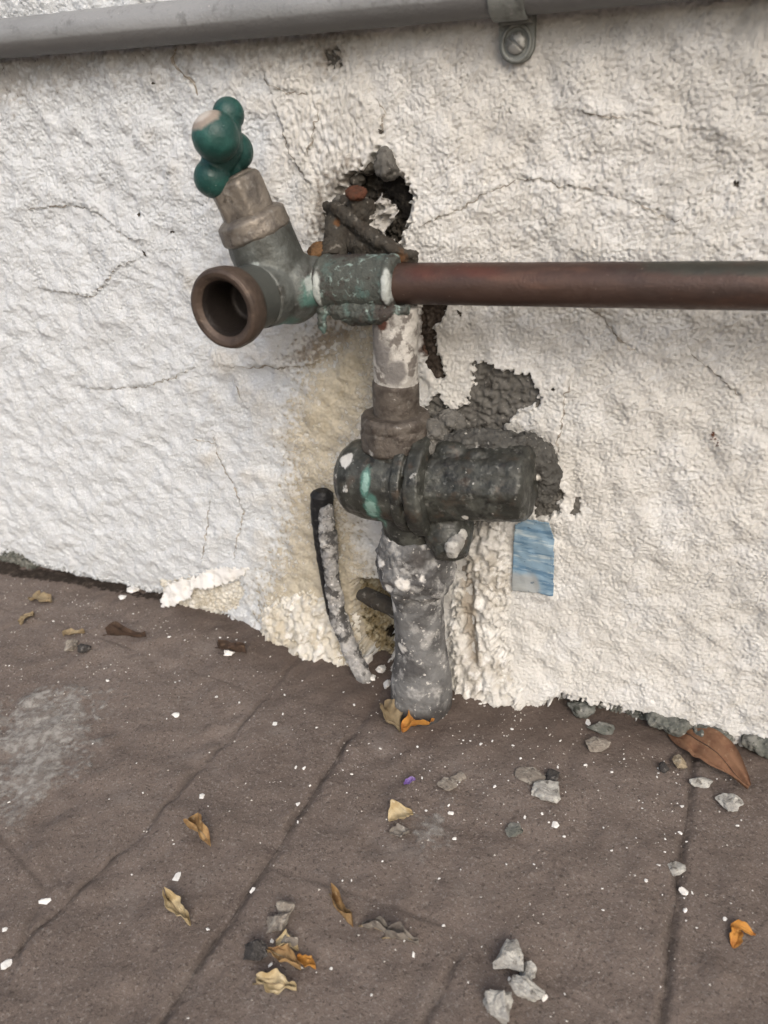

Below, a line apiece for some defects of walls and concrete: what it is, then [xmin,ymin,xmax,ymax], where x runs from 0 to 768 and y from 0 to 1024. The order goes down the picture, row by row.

spalling [332,129,413,245]
spalling [425,360,555,433]
crack [193,437,245,560]
leakage [253,322,375,654]
spalling [535,489,581,518]